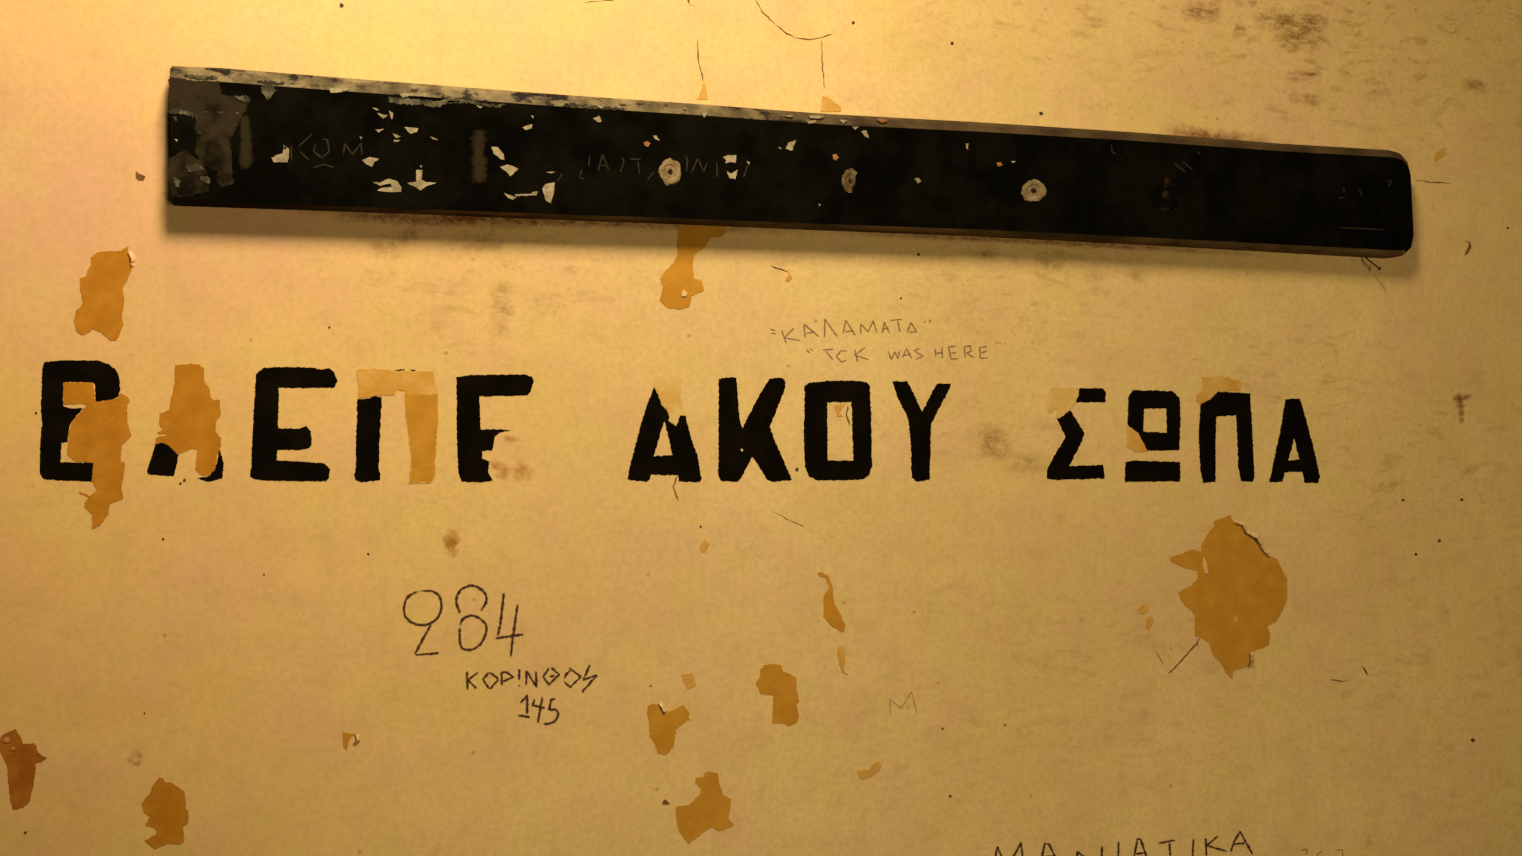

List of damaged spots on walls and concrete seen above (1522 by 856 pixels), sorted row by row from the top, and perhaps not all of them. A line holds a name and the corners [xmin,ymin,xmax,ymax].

crack [687,0,703,80]
crack [756,1,831,86]
peeling [74,246,136,341]
peeling [659,225,726,310]
peeling [63,382,131,529]
peeling [155,363,221,476]
peeling [1168,515,1288,678]
peeling [647,673,696,754]
peeling [755,664,799,726]
peeling [0,729,47,810]
peeling [142,777,189,849]
peeling [662,771,734,844]